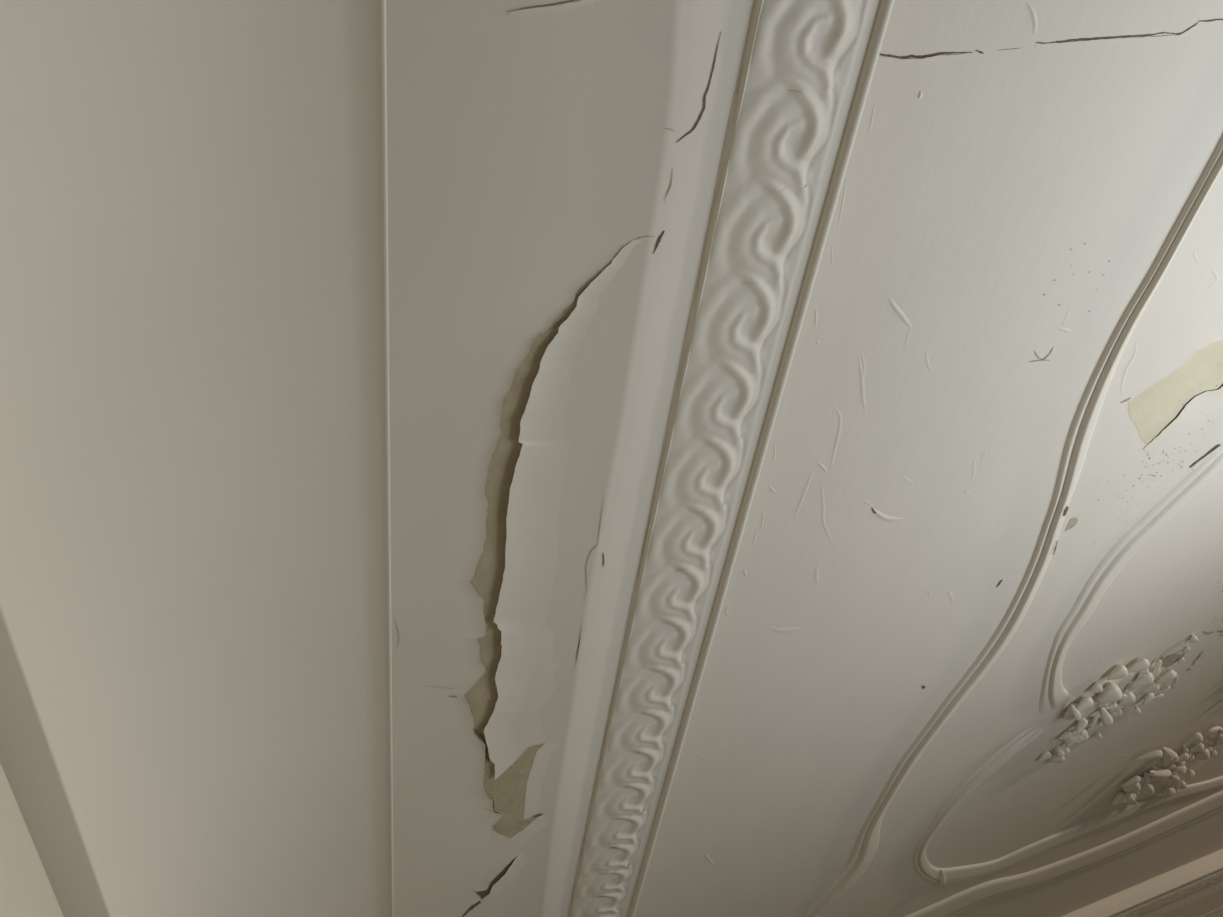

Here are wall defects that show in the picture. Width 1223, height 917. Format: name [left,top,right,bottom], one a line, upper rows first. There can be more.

crack [508,0,602,19]
crack [664,33,721,142]
crack [877,19,1223,65]
peeling [1109,332,1223,525]
crack [1189,444,1222,470]
peeling [428,236,655,851]